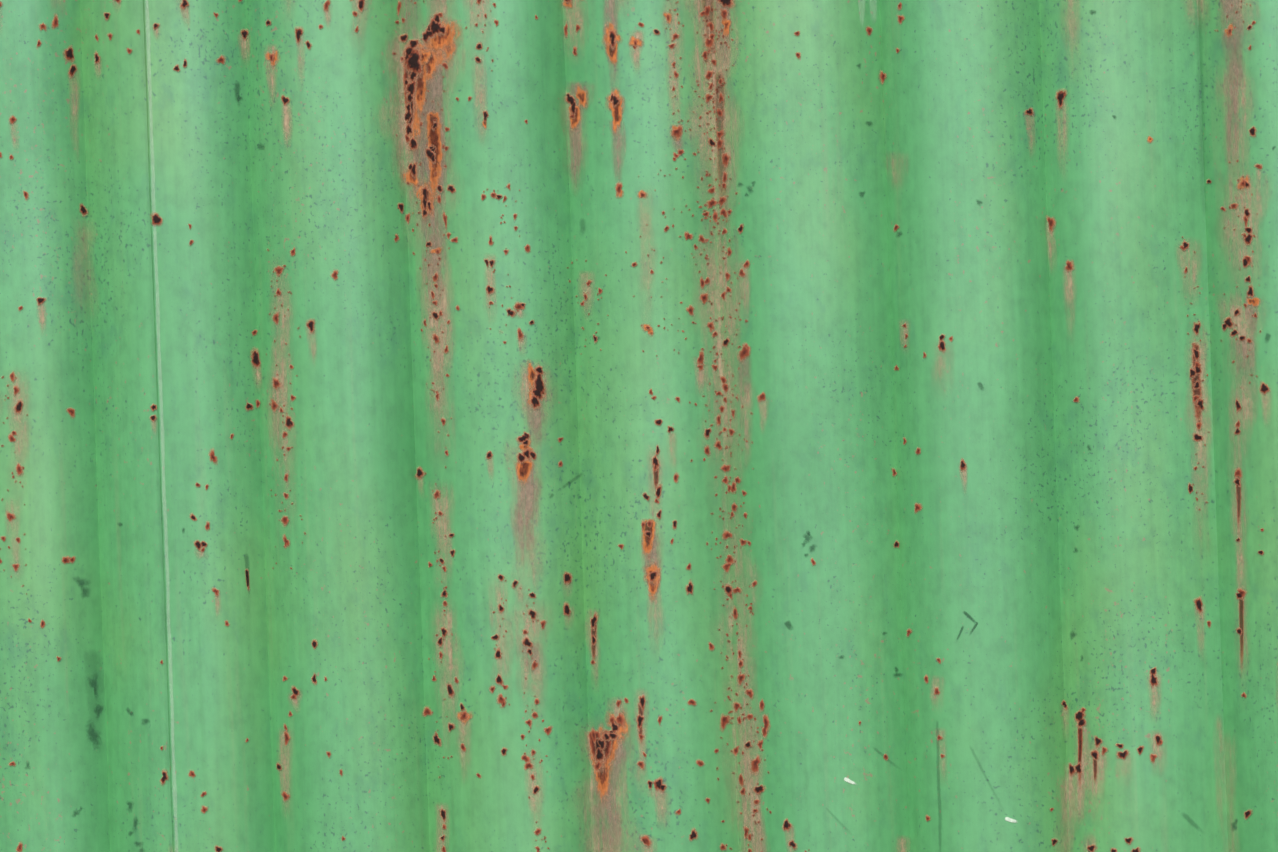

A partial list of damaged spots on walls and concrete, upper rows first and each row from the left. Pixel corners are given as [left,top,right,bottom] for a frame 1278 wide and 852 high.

rust [565,86,587,174]
rust [1,372,28,521]
rust [246,248,315,461]
rust [393,0,498,468]
rust [516,363,546,539]
rust [604,0,771,852]
rust [1187,303,1208,510]
rust [1221,164,1262,363]
rust [1234,468,1245,661]
rust [489,574,552,852]
rust [587,695,681,852]
rust [1062,701,1163,807]